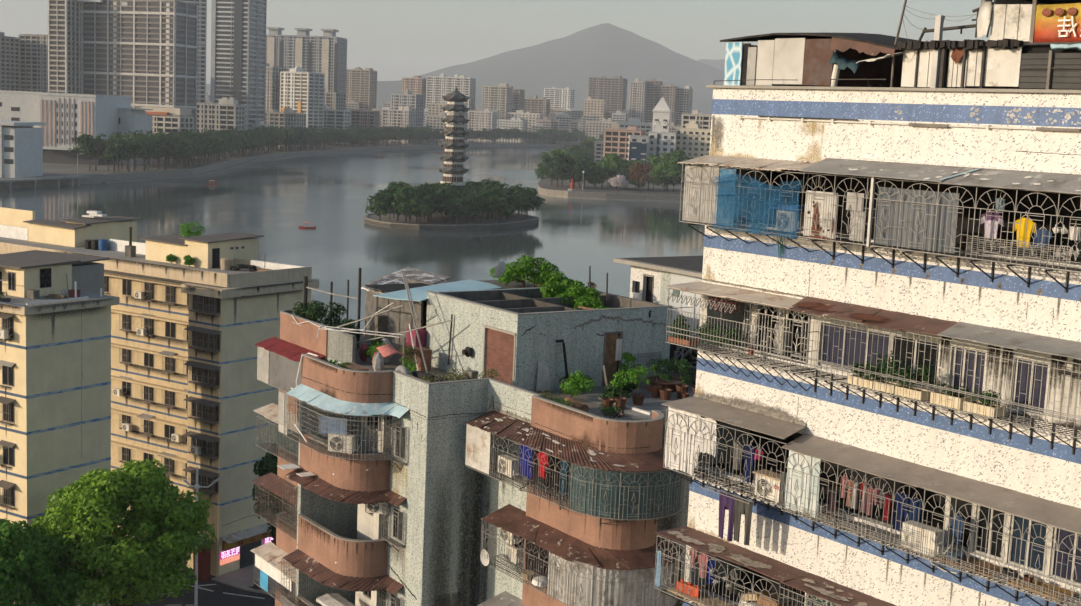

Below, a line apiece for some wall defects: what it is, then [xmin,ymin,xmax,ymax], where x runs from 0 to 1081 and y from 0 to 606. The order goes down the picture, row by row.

leakage [712,116,723,148]
peeling [1005,107,1081,125]
corrosion [809,202,834,240]
crack [574,310,667,336]
corrosion [798,302,889,322]
peeling [480,417,565,452]
leakage [459,472,488,606]
peeling [668,531,772,569]
peeling [802,578,868,606]